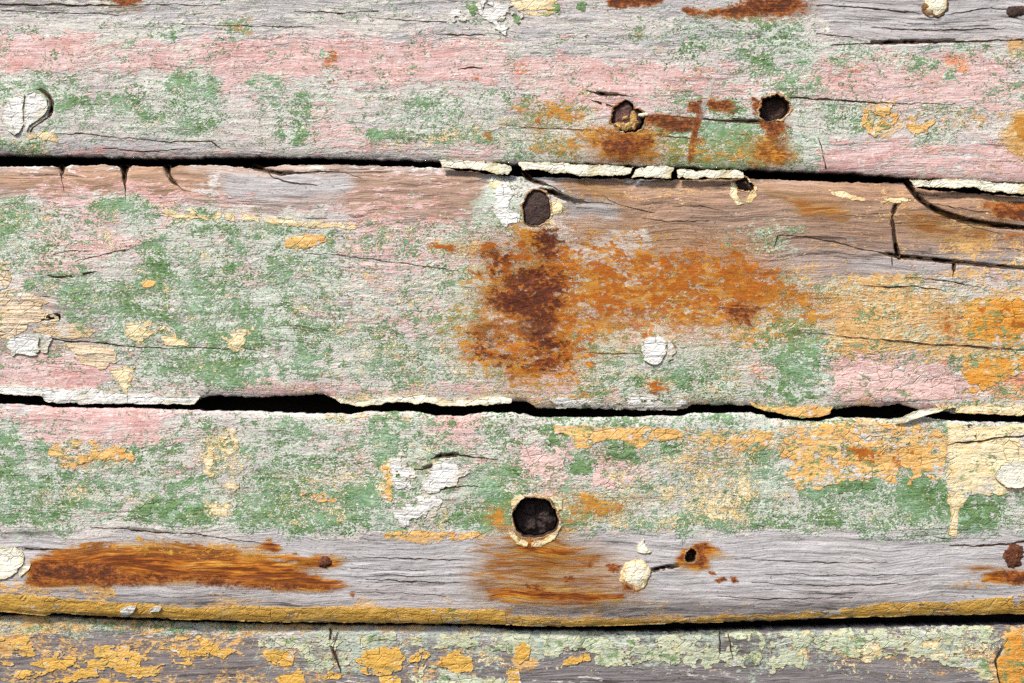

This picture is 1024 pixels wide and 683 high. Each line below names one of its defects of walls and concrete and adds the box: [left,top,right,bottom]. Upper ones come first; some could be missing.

rust [682,0,811,19]
peeling [2,91,57,142]
rust [512,95,796,168]
crack [252,163,361,186]
crack [521,168,719,222]
rust [428,215,855,405]
peeling [519,297,1024,537]
peeling [381,449,486,541]
rust [25,536,354,596]
peeling [509,525,561,547]
rust [460,490,635,604]
peeling [0,594,1024,683]